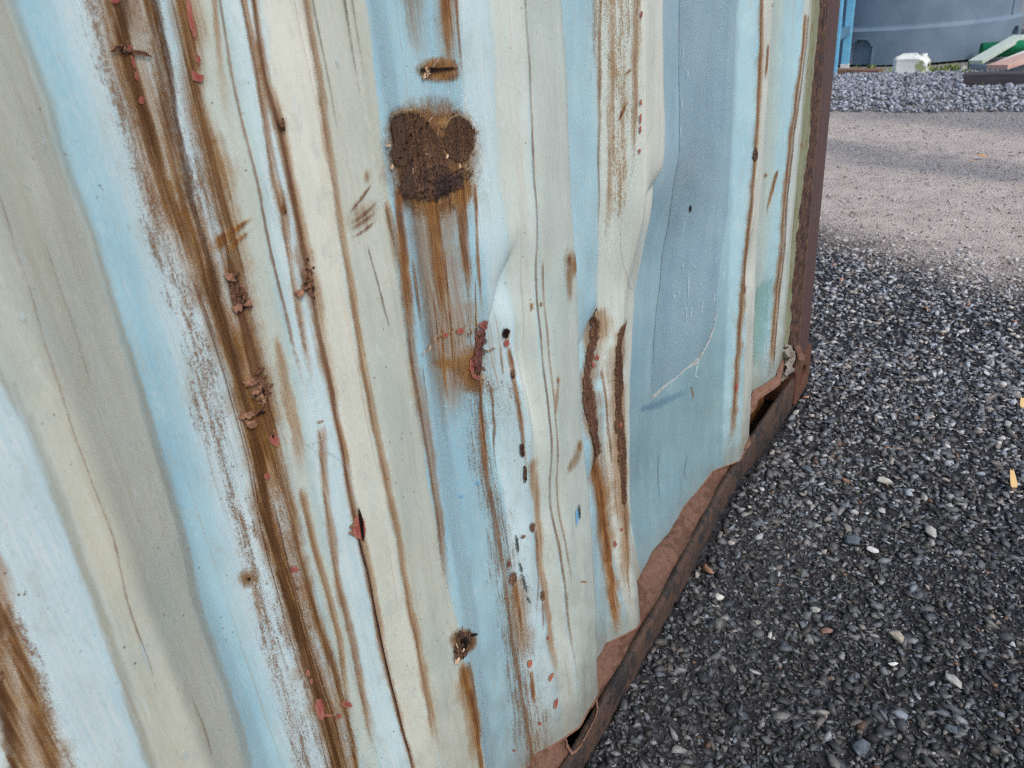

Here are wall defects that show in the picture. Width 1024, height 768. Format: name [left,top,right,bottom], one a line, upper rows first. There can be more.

peeling [186,1,196,38]
rust [80,0,368,768]
peeling [224,271,253,313]
peeling [238,367,274,428]
peeling [349,509,366,541]
rust [351,293,434,722]
peeling [423,320,496,392]
rust [467,0,629,767]
rust [732,0,773,421]
rust [771,16,809,360]
rust [0,581,76,768]
rust [358,538,414,768]